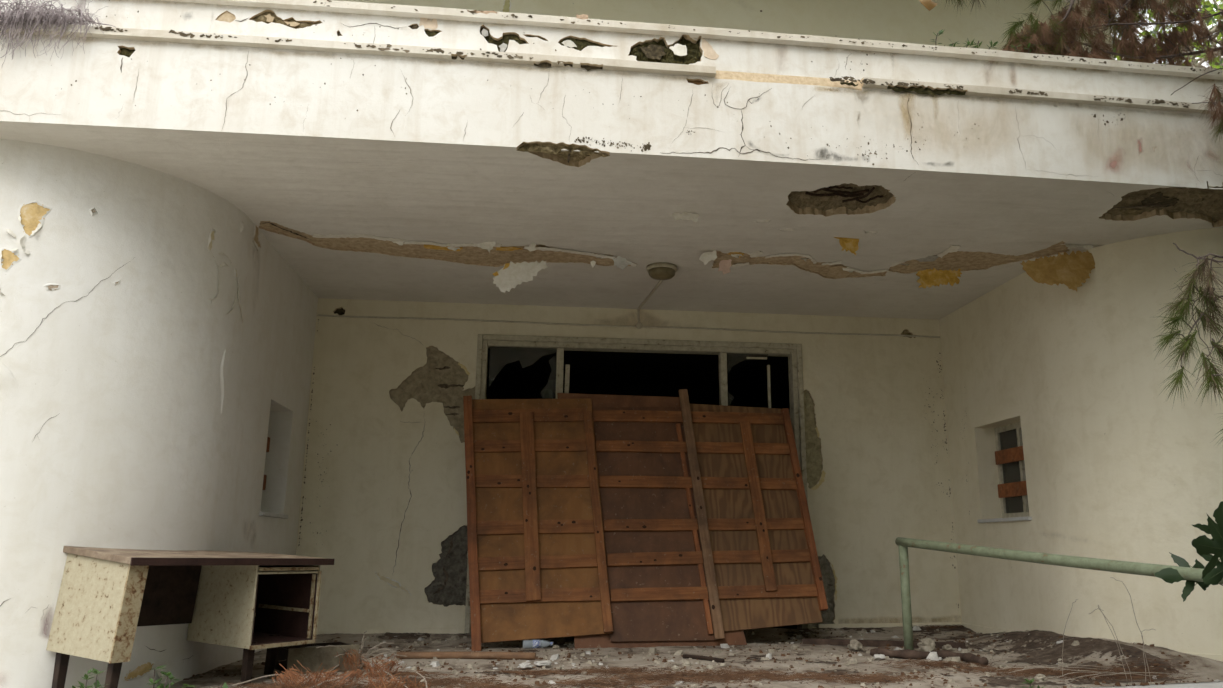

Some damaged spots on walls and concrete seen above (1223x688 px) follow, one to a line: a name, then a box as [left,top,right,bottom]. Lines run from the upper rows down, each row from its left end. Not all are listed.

spalling [216,11,321,29]
spalling [467,0,604,71]
spalling [629,37,719,65]
crack [222,51,249,129]
spalling [516,142,610,163]
crack [665,85,827,160]
spalling [789,183,893,211]
spalling [1106,182,1223,223]
spalling [699,237,1095,292]
crack [0,263,127,357]
spalling [389,346,475,443]
spalling [425,525,468,607]